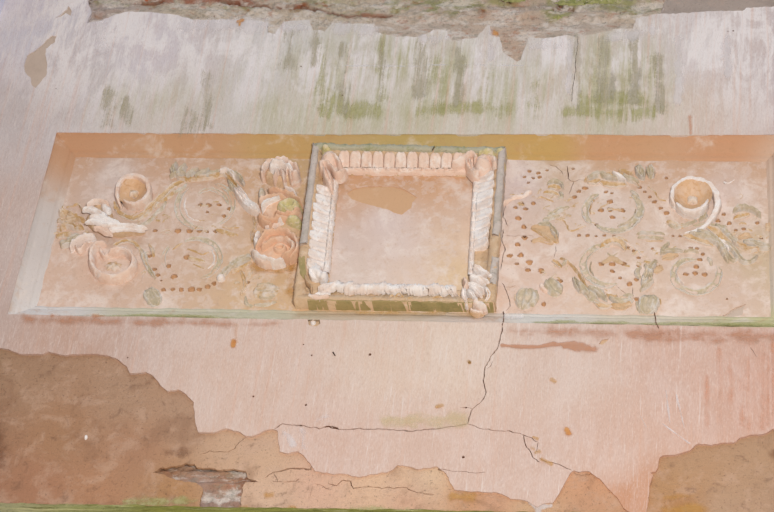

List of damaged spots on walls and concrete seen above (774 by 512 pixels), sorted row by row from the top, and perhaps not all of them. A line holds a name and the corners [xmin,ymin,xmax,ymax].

spalling [89,0,774,61]
peeling [24,36,56,88]
leakage [454,49,465,106]
peeling [347,186,417,215]
peeling [0,349,627,512]
peeling [647,430,774,512]